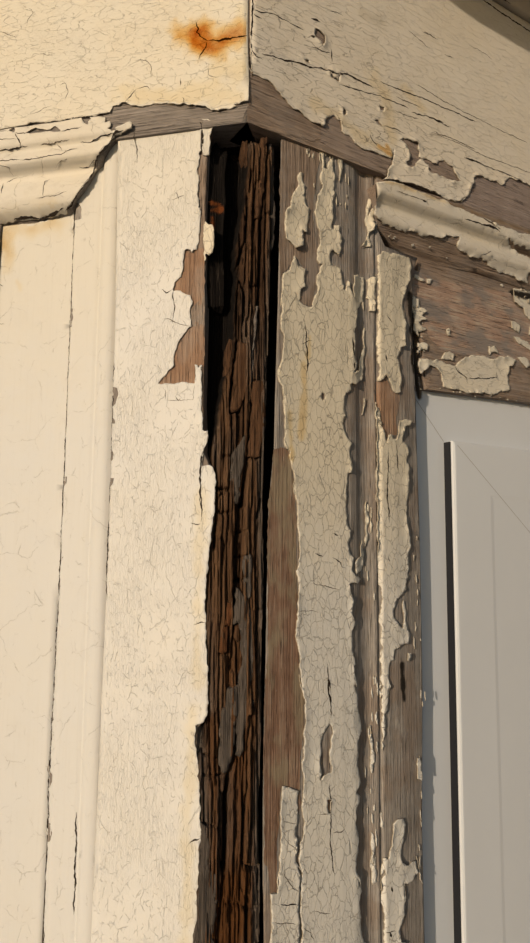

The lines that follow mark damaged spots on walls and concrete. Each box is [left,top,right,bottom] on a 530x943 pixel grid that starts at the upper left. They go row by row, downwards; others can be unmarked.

peeling [83,72,391,384]
crack [188,0,530,179]
peeling [402,139,458,181]
crack [466,219,499,255]
peeling [461,176,530,229]
crack [190,448,204,532]
peeling [354,198,530,778]
peeling [263,447,304,943]
peeling [320,724,332,777]
peeling [367,789,423,943]